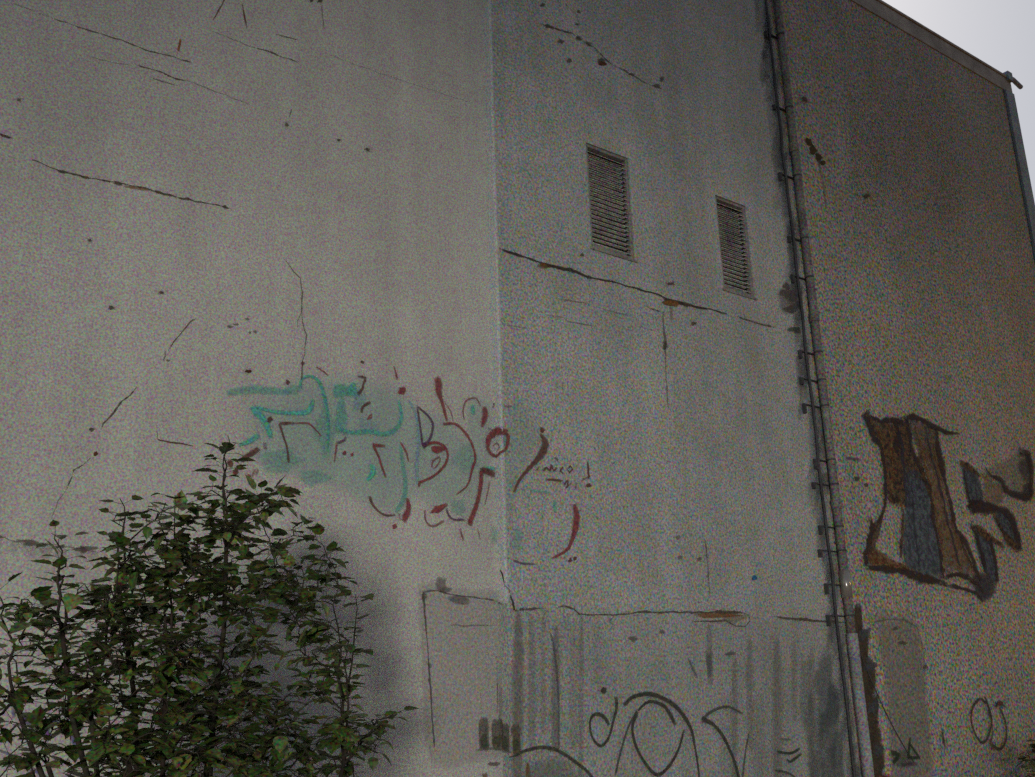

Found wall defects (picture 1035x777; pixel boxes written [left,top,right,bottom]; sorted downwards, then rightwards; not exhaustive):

crack [54,18,191,84]
crack [540,2,664,89]
crack [34,160,229,209]
crack [285,260,307,361]
crack [502,249,775,403]
crack [500,541,844,627]